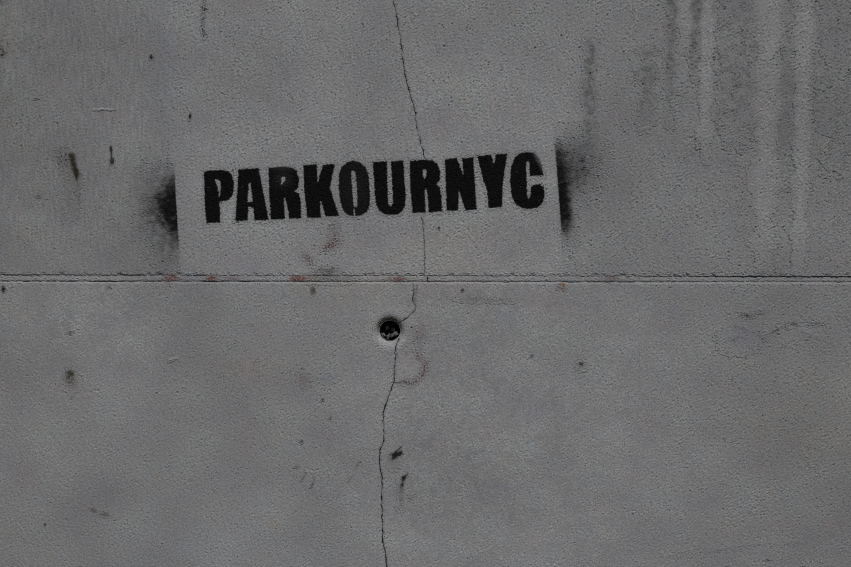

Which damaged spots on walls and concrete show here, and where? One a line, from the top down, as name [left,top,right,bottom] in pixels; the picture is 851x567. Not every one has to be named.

crack [392,0,425,177]
crack [346,214,430,567]